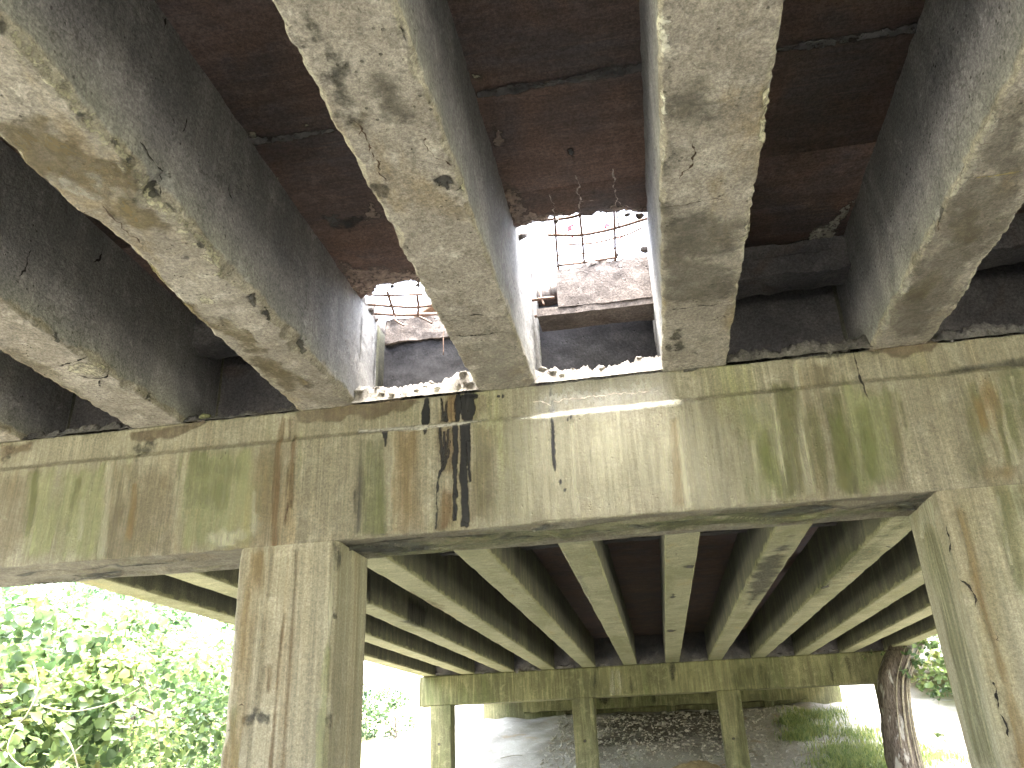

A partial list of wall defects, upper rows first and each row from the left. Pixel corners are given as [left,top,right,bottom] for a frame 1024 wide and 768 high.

crack [353,120,386,183]
crack [680,144,697,177]
spalling [504,183,647,270]
spalling [340,261,444,355]
crack [853,352,869,399]
water stain [297,392,478,529]